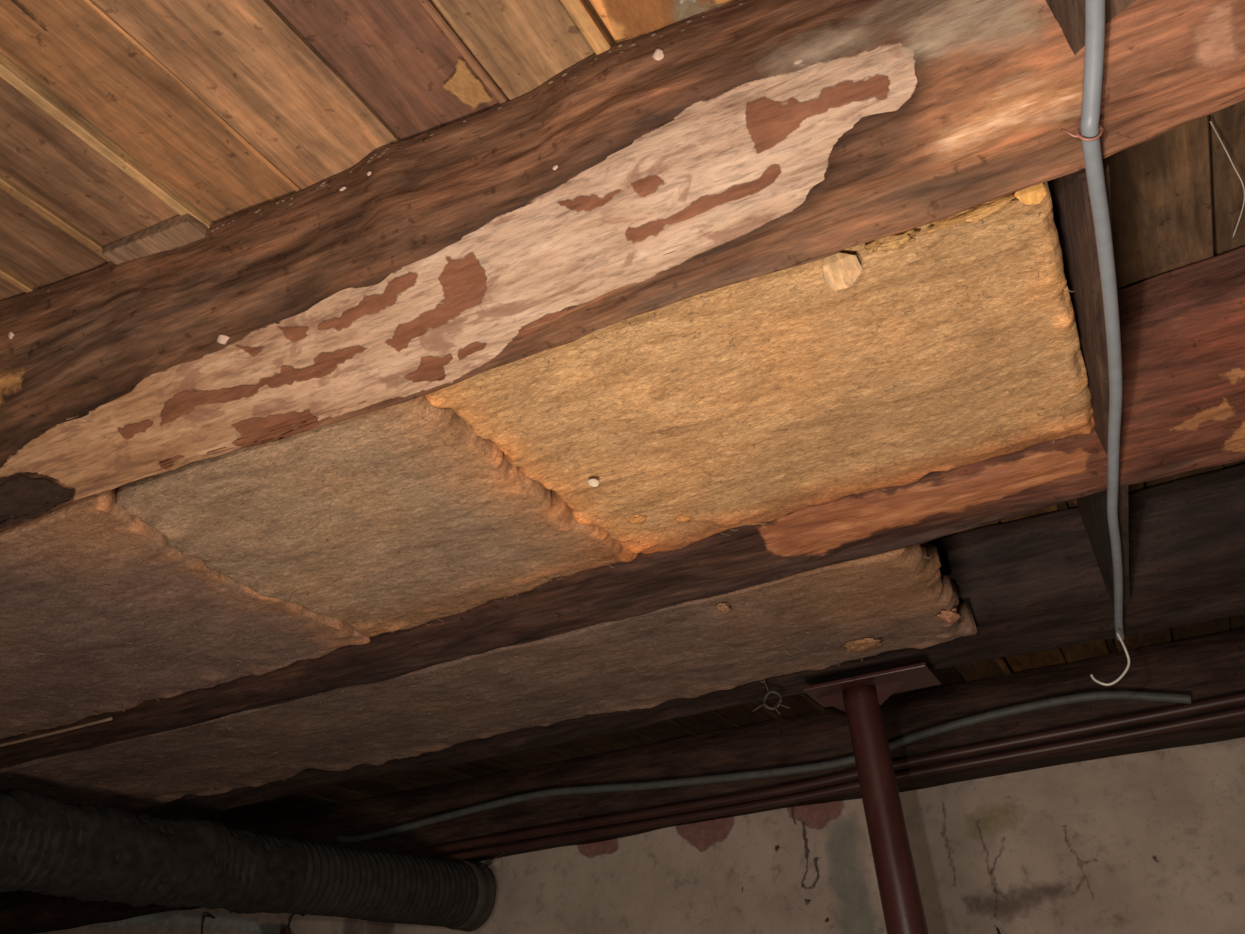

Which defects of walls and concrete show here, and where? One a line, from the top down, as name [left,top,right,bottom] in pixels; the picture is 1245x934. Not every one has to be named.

leakage [604,0,712,40]
peeling [0,0,1026,501]
peeling [1221,368,1245,384]
peeling [1170,398,1245,452]